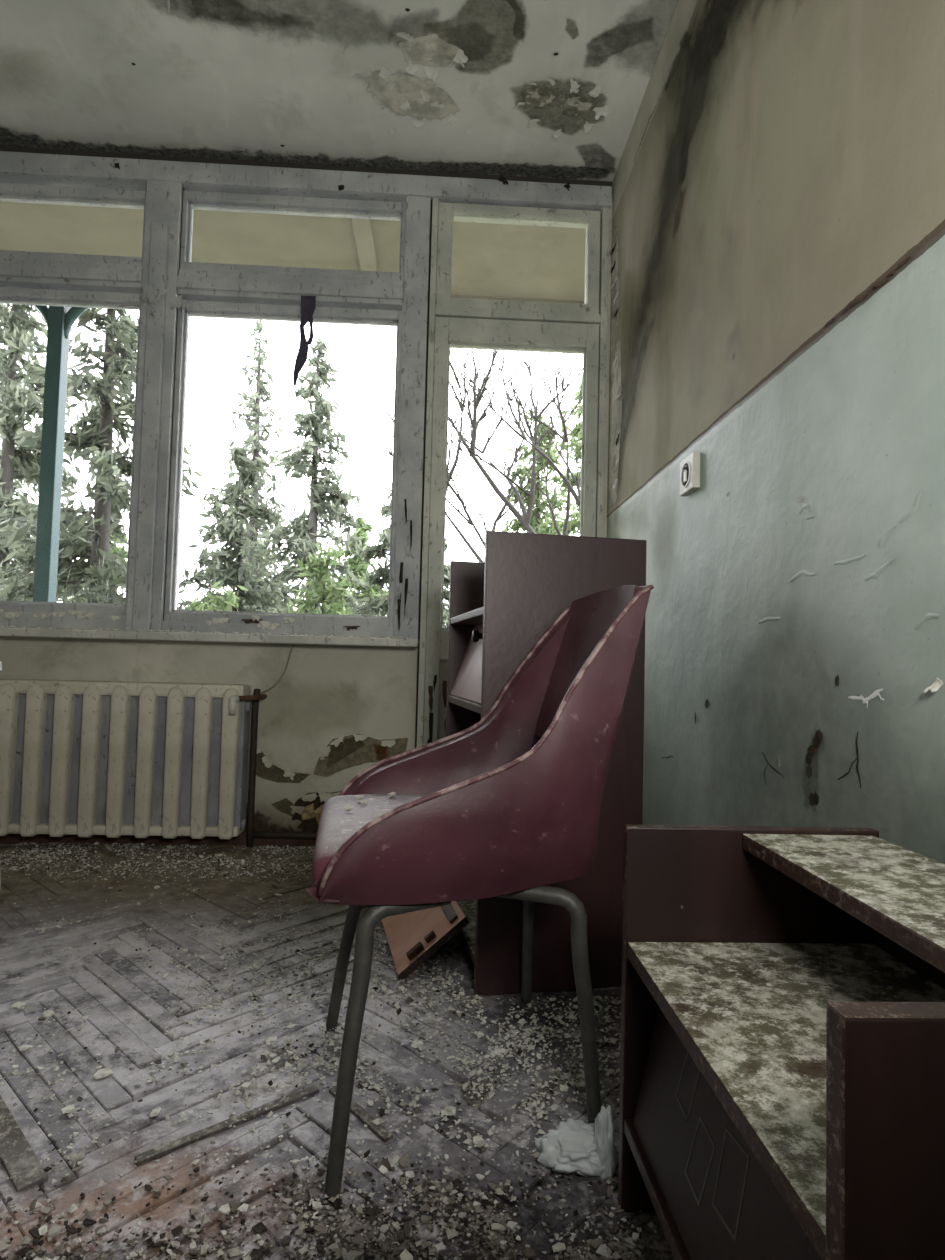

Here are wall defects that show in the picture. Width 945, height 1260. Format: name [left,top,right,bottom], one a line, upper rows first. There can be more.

damp [426,0,525,72]
damp [587,19,652,66]
peeling [352,32,475,135]
peeling [513,78,609,139]
damp [621,0,744,416]
peeling [924,678,944,693]
flaking render [249,734,408,832]
crack [838,732,861,788]